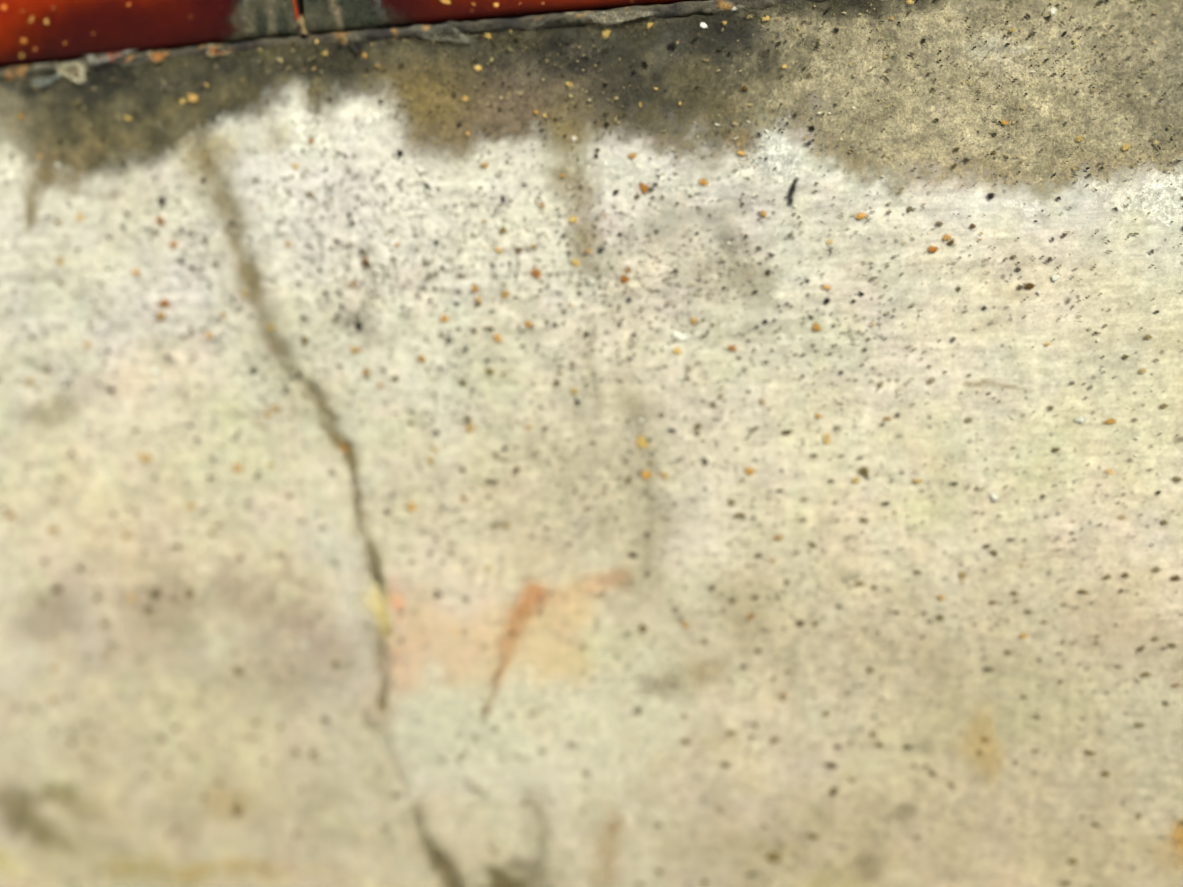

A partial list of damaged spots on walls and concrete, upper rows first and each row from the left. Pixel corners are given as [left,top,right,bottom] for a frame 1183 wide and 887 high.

water stain [0,0,1183,223]
crack [198,153,261,299]
crack [315,398,382,587]
crack [378,684,386,711]
crack [425,841,463,887]